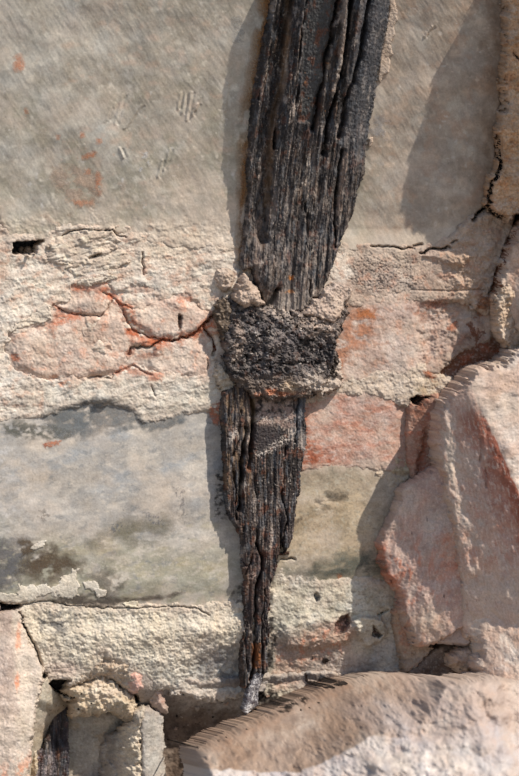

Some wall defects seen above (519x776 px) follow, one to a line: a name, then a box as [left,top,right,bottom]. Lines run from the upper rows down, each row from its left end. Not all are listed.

crack [378,240,456,254]
crack [411,136,519,295]
crack [53,293,216,393]
water stain [5,399,184,438]